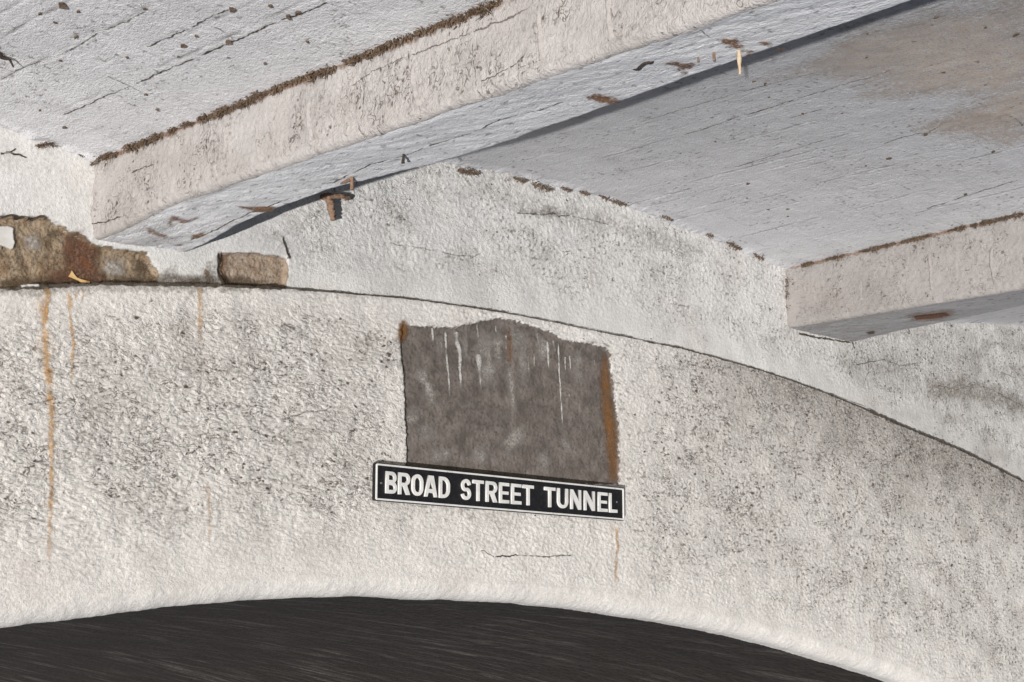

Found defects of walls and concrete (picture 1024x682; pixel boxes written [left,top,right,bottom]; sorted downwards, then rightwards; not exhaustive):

spalling [0,216,159,289]
spalling [218,253,288,287]
rust [915,313,950,322]
rust [42,290,54,455]
leakage [431,328,462,388]
leakage [528,337,571,422]
rust [601,357,617,479]
crack [481,550,571,558]